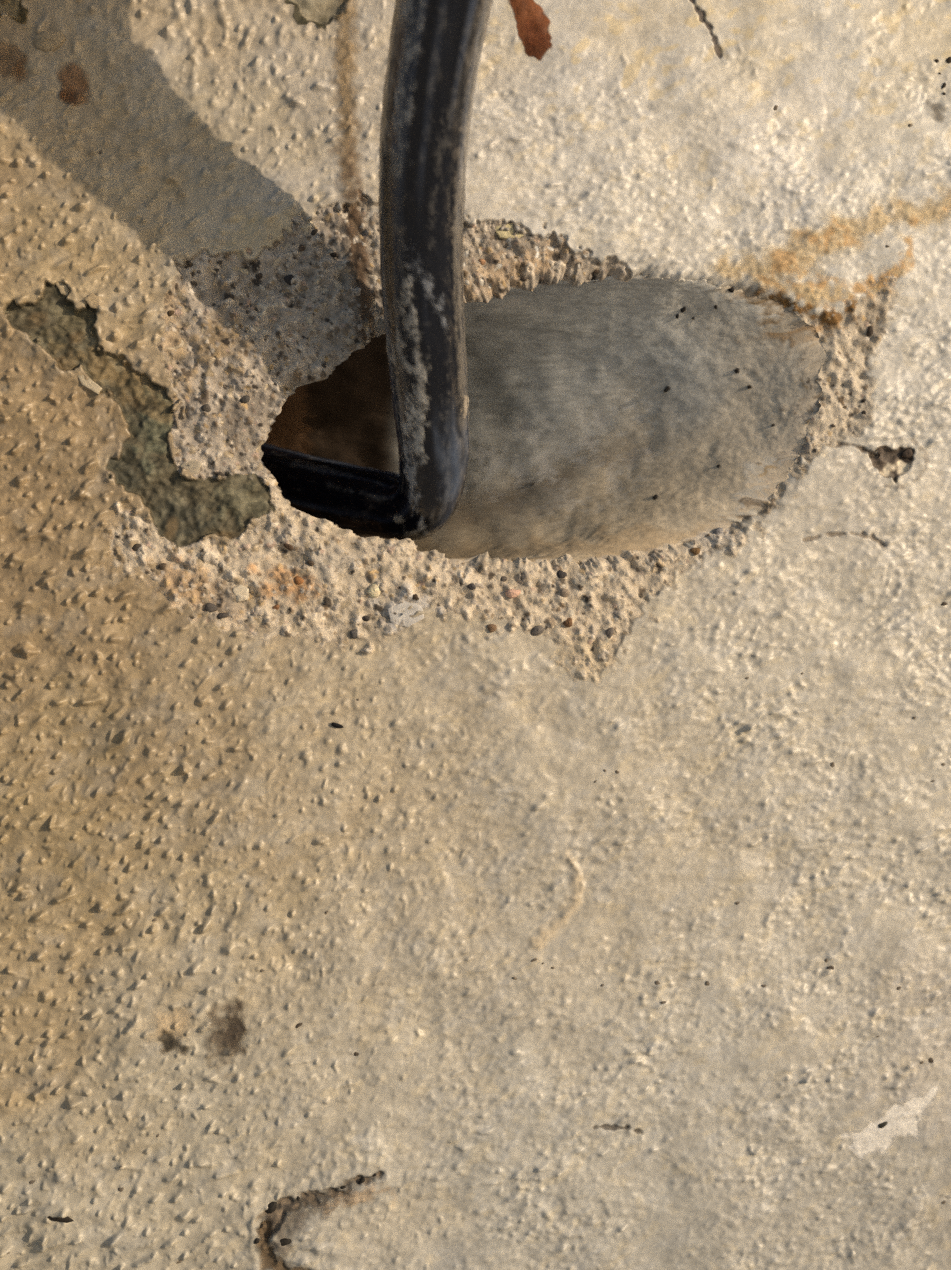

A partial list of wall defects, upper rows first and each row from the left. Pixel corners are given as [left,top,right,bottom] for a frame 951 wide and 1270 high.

peeling [285,0,346,30]
rust [510,0,552,60]
spalling [5,189,899,683]
peeling [870,446,914,483]
crack [254,1171,382,1270]